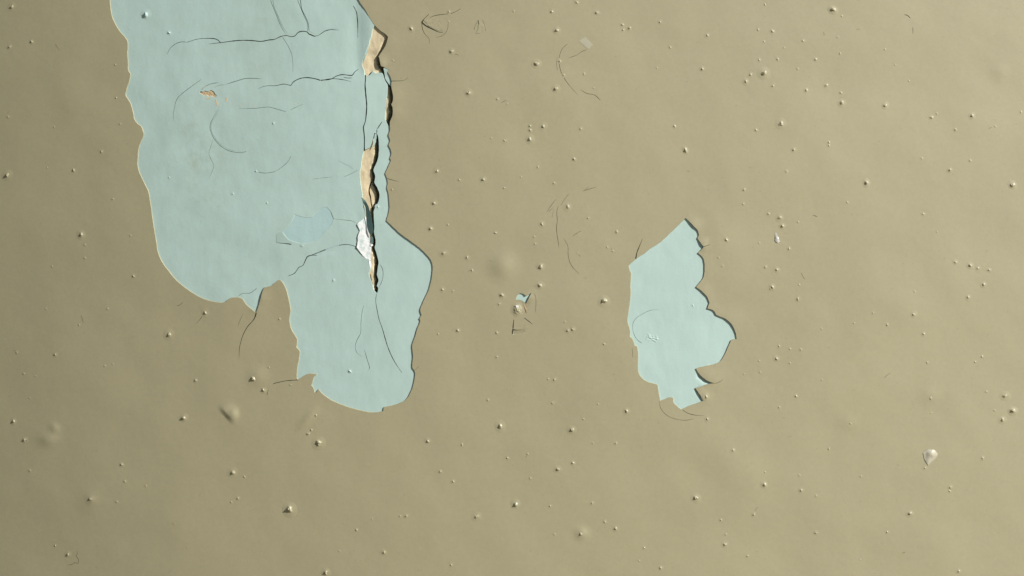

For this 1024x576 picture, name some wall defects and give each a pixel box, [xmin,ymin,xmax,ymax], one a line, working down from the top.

crack [167,2,382,179]
peeling [110,0,433,413]
crack [289,213,357,276]
peeling [627,218,737,409]